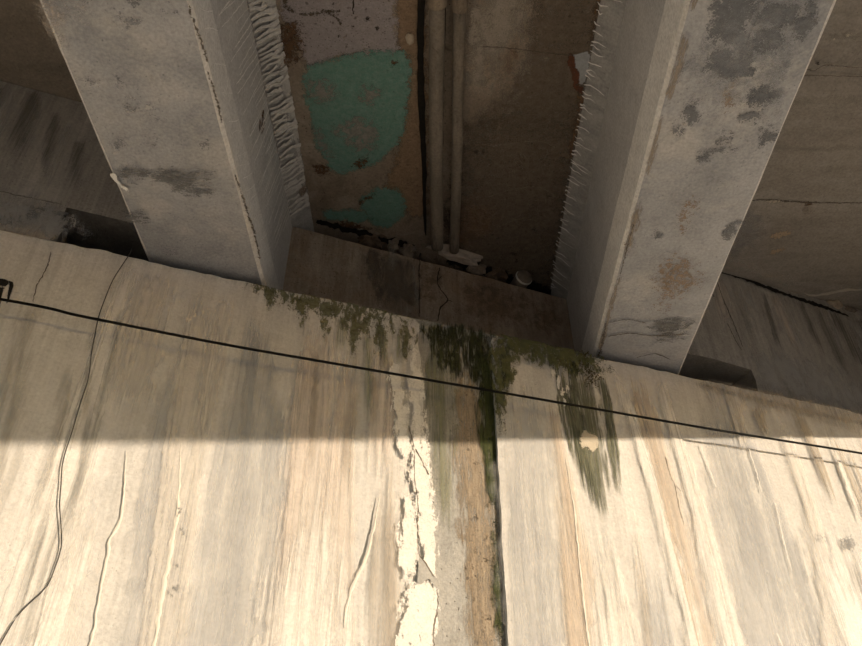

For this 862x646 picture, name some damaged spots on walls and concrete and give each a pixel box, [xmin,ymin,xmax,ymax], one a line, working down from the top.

crack [752,197,862,205]
crack [33,252,51,300]
crack [418,253,452,321]
water stain [140,251,840,646]
peeling [386,344,442,646]